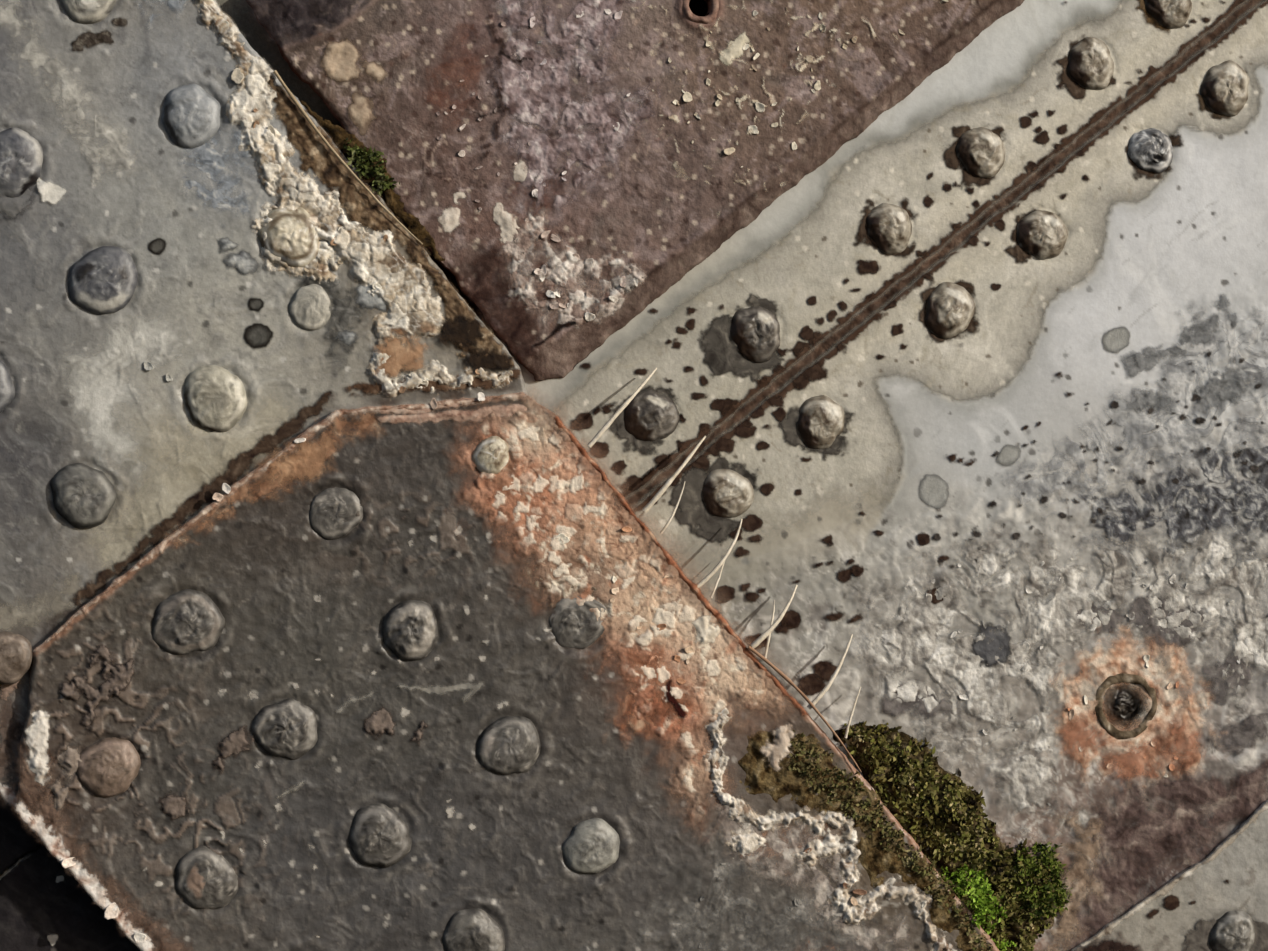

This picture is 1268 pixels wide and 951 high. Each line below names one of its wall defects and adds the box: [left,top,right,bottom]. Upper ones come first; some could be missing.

rust [173,412,378,545]
rust [454,0,1268,831]
crack [0,844,43,881]
peeling [0,783,153,951]
rust [1048,626,1268,951]